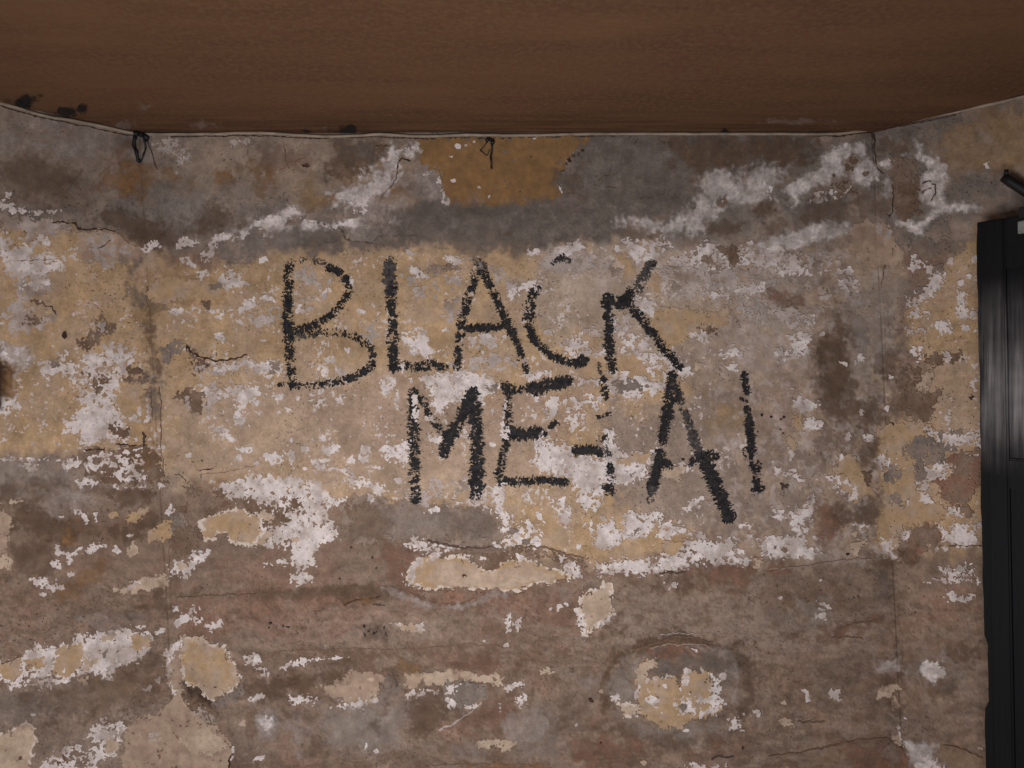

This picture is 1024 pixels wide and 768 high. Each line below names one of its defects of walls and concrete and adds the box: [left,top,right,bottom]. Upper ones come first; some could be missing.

damp [0,192,62,216]
crack [1,105,659,201]
damp [94,132,904,258]
crack [814,115,956,218]
damp [863,143,977,235]
spalling [0,132,982,647]
peeling [0,604,385,768]
damp [255,714,297,738]
spalling [399,668,529,732]
peeling [599,657,763,732]
peeling [876,684,984,768]
damp [917,645,977,684]